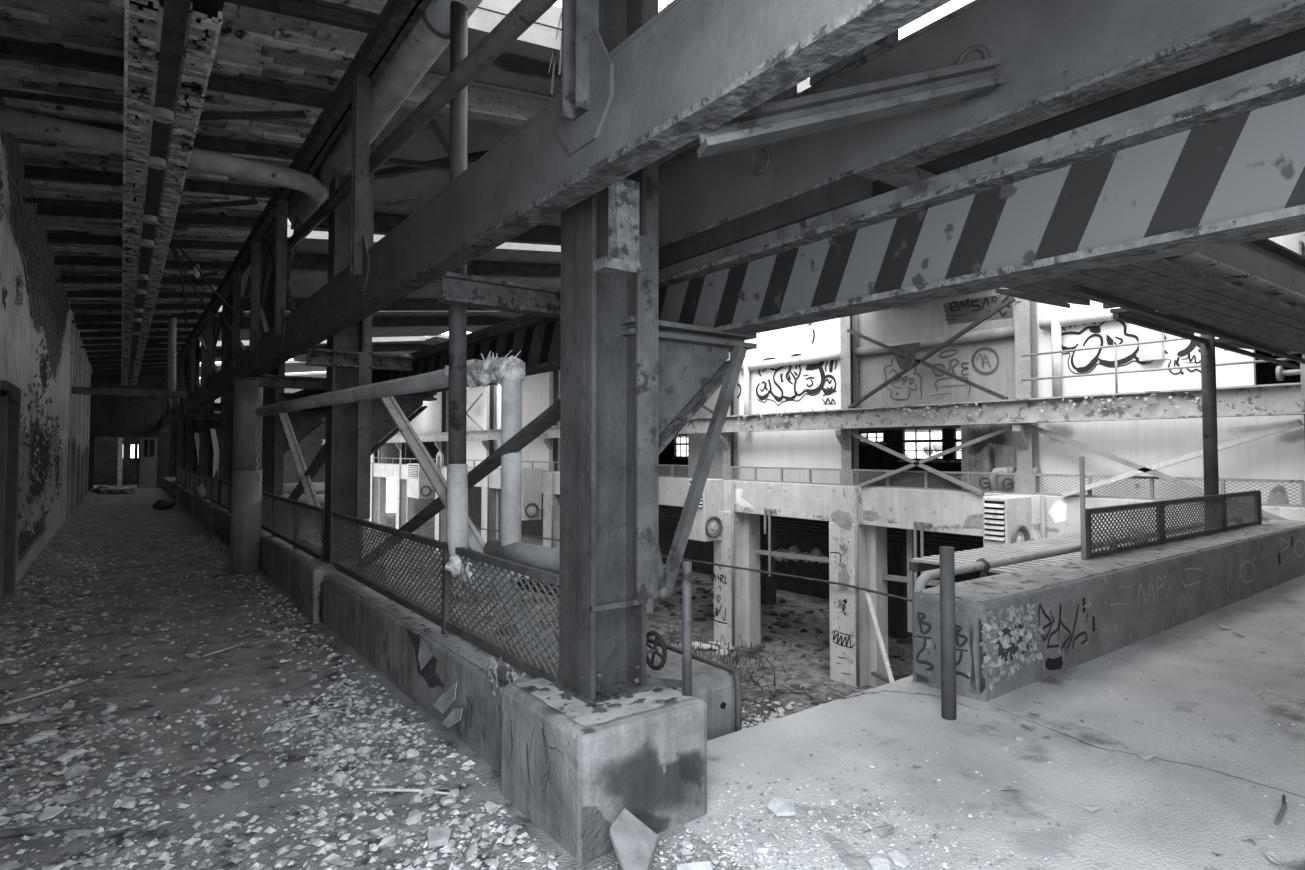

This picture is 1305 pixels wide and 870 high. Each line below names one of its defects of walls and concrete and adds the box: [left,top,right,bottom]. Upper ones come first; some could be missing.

flaking render [0,131,70,553]